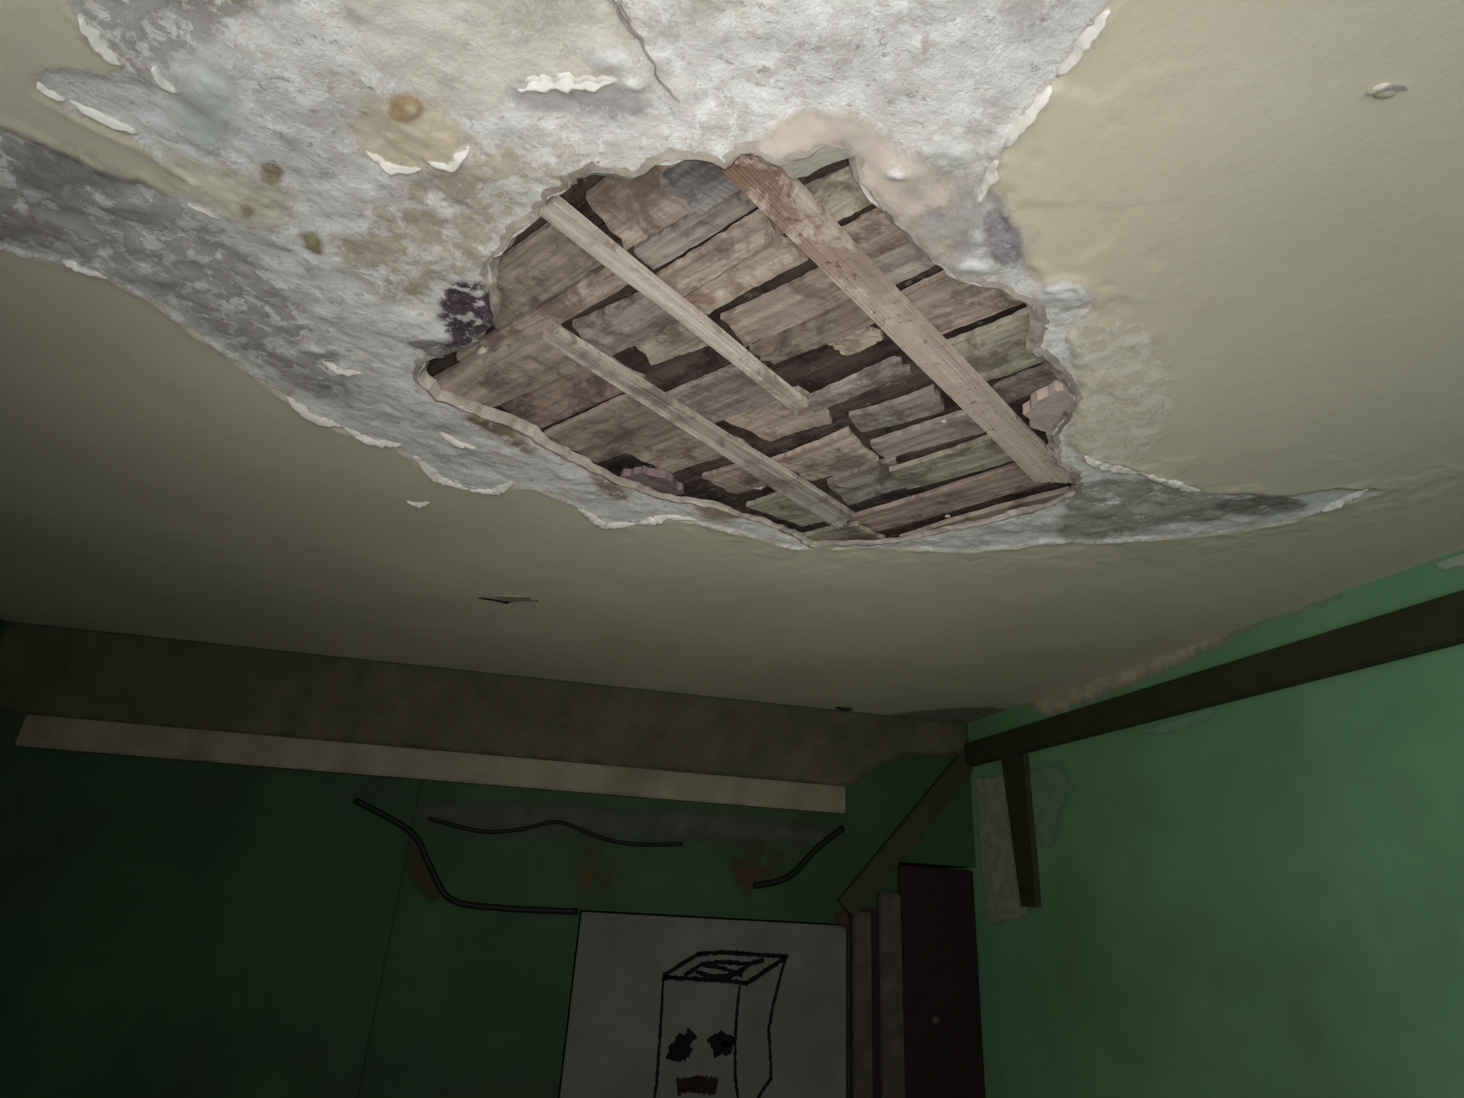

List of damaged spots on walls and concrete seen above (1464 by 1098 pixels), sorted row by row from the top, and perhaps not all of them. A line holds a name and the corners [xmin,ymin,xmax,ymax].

crack [608,0,680,103]
damp [0,134,345,395]
peeling [0,0,1381,552]
damp [1059,479,1305,541]
peeling [975,774,1030,924]
peeling [1030,765,1068,846]